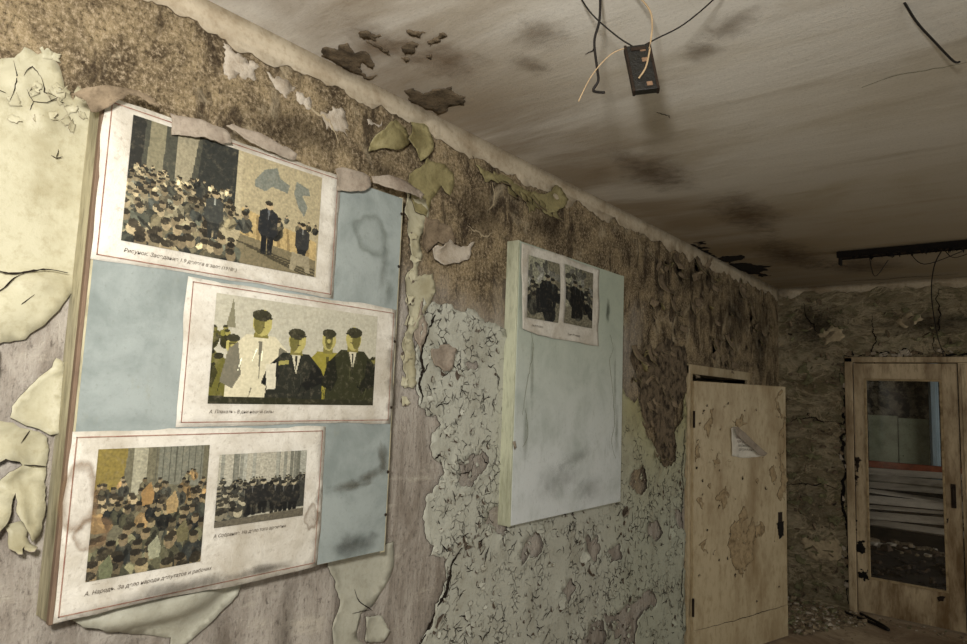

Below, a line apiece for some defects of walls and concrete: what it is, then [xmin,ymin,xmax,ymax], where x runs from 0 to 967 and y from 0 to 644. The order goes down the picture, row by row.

peeling [321,29,447,80]
crack [0,64,58,110]
peeling [404,86,465,115]
peeling [0,46,90,343]
crack [0,268,67,305]
peeling [400,157,774,644]
peeling [327,542,394,644]